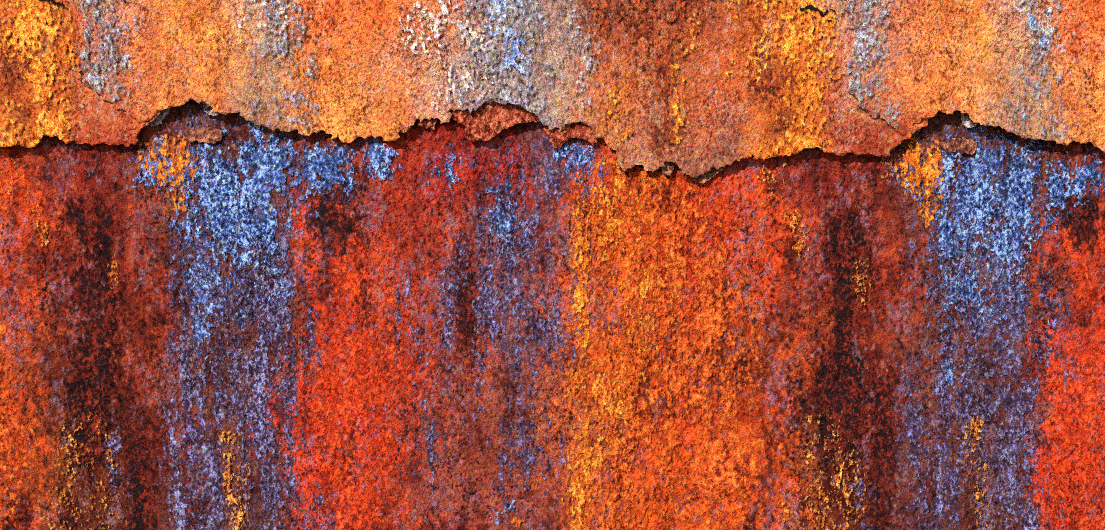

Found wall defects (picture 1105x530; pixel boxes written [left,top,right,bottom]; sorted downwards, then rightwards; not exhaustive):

crack [40,0,65,8]
crack [800,4,836,22]
rust [137,127,223,218]
rust [894,136,978,226]
rust [0,195,159,530]
rust [285,172,422,530]
rust [440,239,481,354]
rust [738,364,760,390]
rust [769,206,901,530]
rust [1026,184,1105,530]
rust [219,418,250,530]
rust [963,416,989,530]